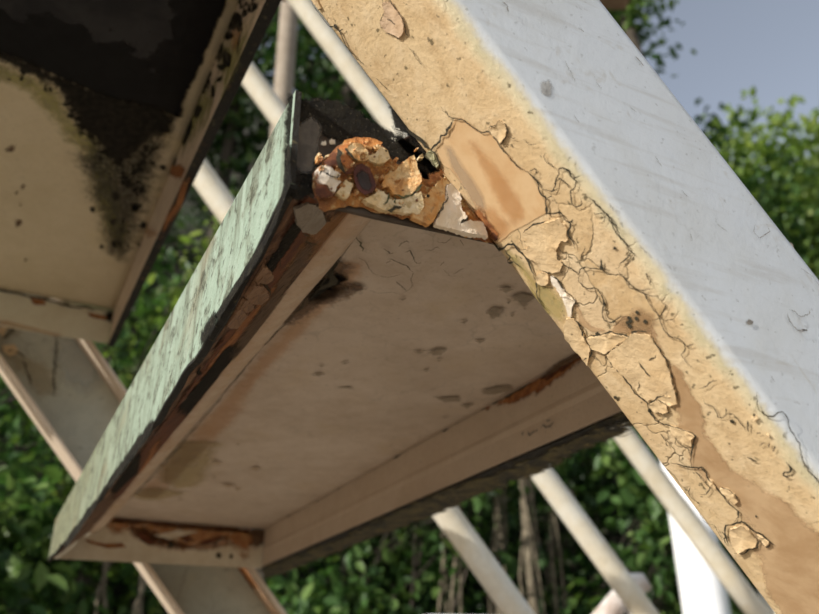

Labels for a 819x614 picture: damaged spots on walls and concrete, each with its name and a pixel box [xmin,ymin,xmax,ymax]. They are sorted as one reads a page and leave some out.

peeling [380,0,407,39]
leakage [0,0,257,260]
leakage [65,421,153,550]
rust [111,215,315,500]
rust [265,243,352,345]
leakage [199,94,439,345]
rust [482,353,582,410]
crack [406,107,693,367]
crack [646,401,739,538]
crack [703,380,747,431]
crack [757,399,819,482]
rust [86,517,265,590]